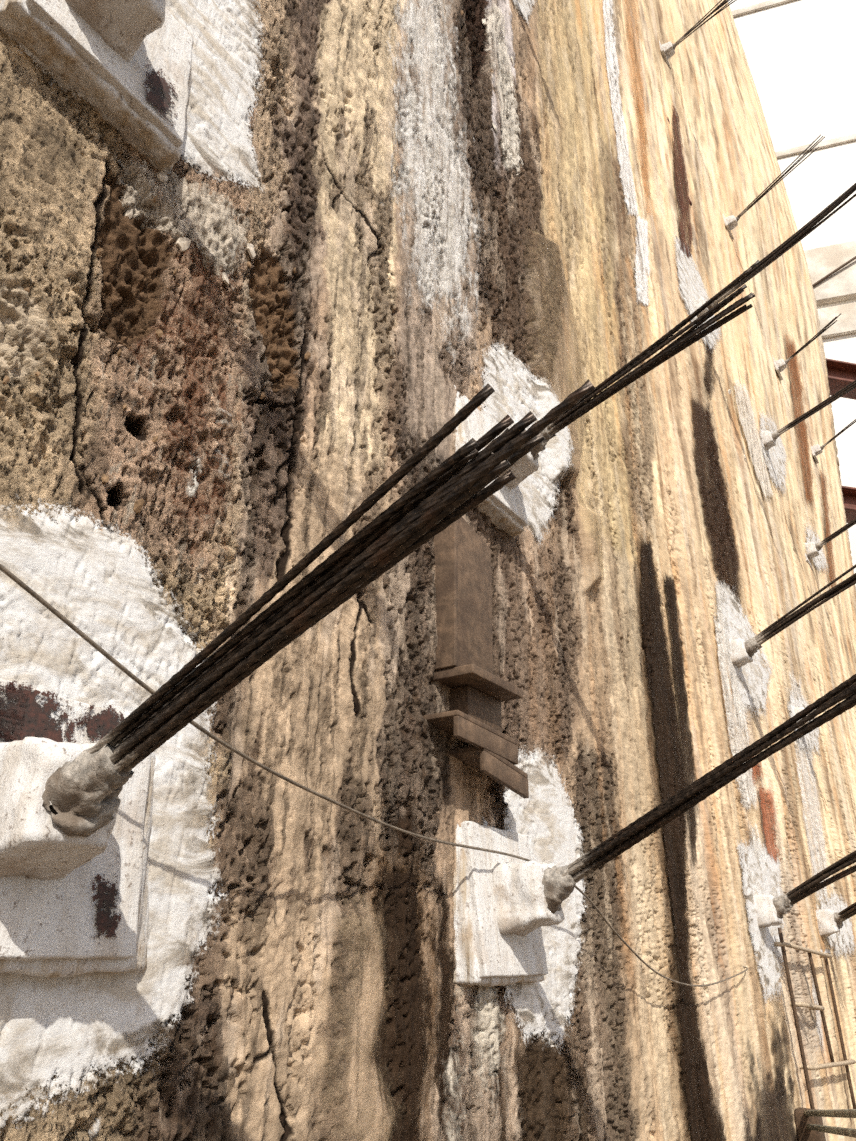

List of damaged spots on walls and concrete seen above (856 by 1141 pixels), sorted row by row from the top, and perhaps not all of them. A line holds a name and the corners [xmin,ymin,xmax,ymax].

rust [141,64,178,126]
leakage [391,0,478,358]
rust [0,681,124,743]
rust [752,756,781,860]
rust [91,873,121,944]
crack [253,991,293,1141]